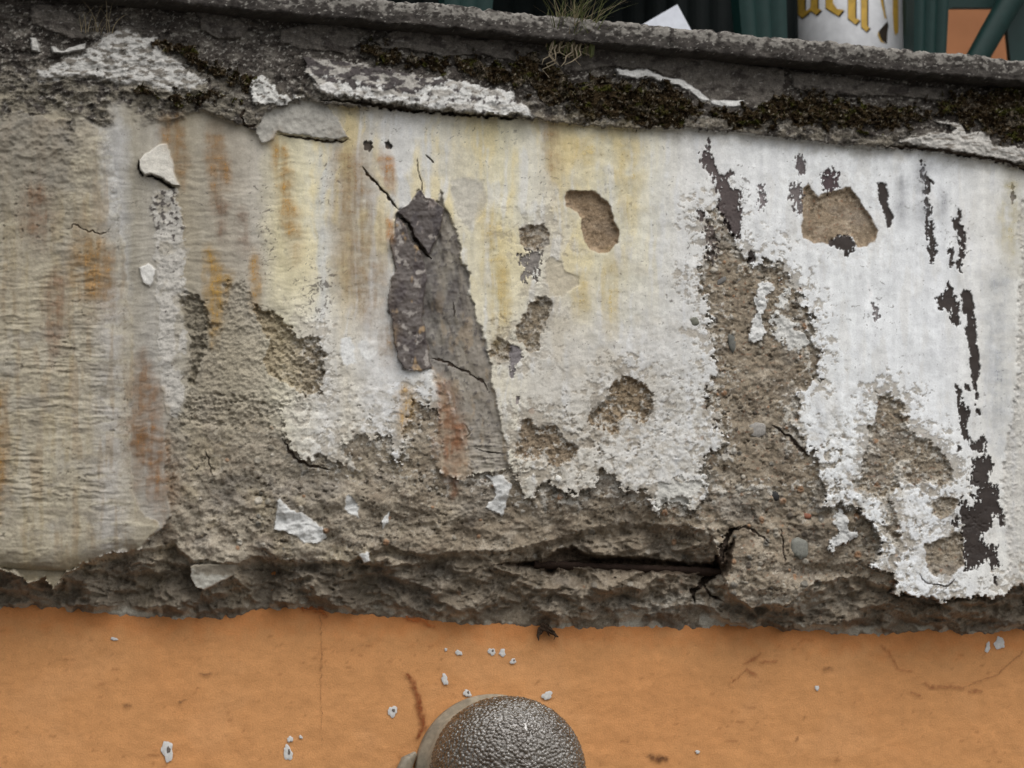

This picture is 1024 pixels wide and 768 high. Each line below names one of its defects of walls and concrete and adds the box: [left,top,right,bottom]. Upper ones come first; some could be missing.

crack [363,167,396,207]
spalling [0,136,1024,653]
crack [496,525,786,602]